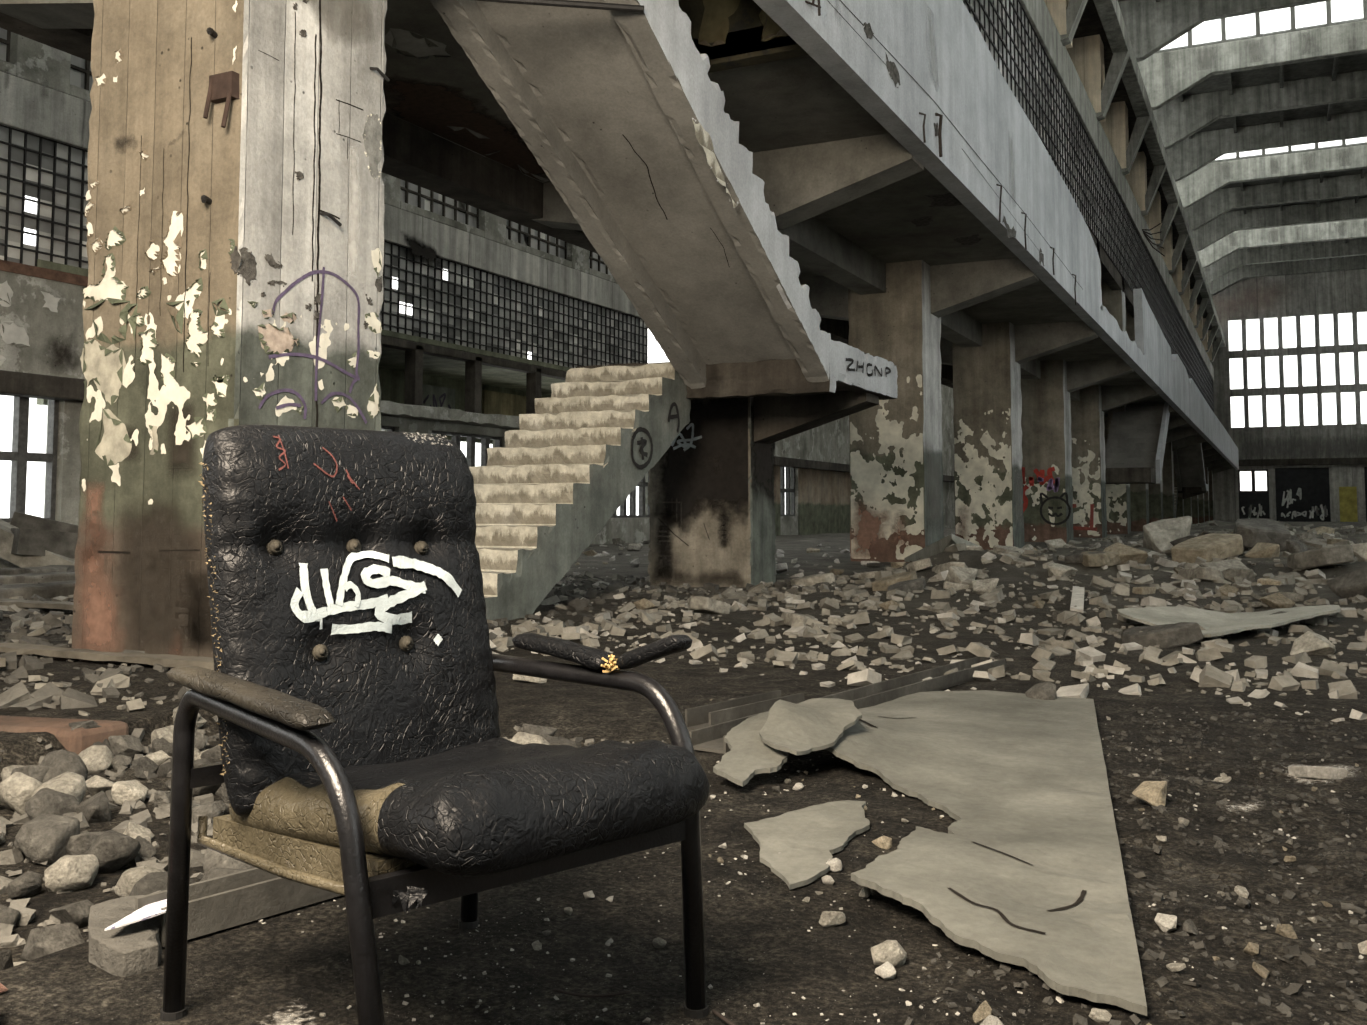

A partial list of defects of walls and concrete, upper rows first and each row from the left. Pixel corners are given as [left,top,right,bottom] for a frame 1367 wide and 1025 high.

peeling [0,280,30,367]
peeling [40,290,61,312]
peeling [80,179,383,486]
rust [83,489,114,651]
leakage [655,508,743,585]
peeling [850,374,924,560]
peeling [954,408,1127,548]